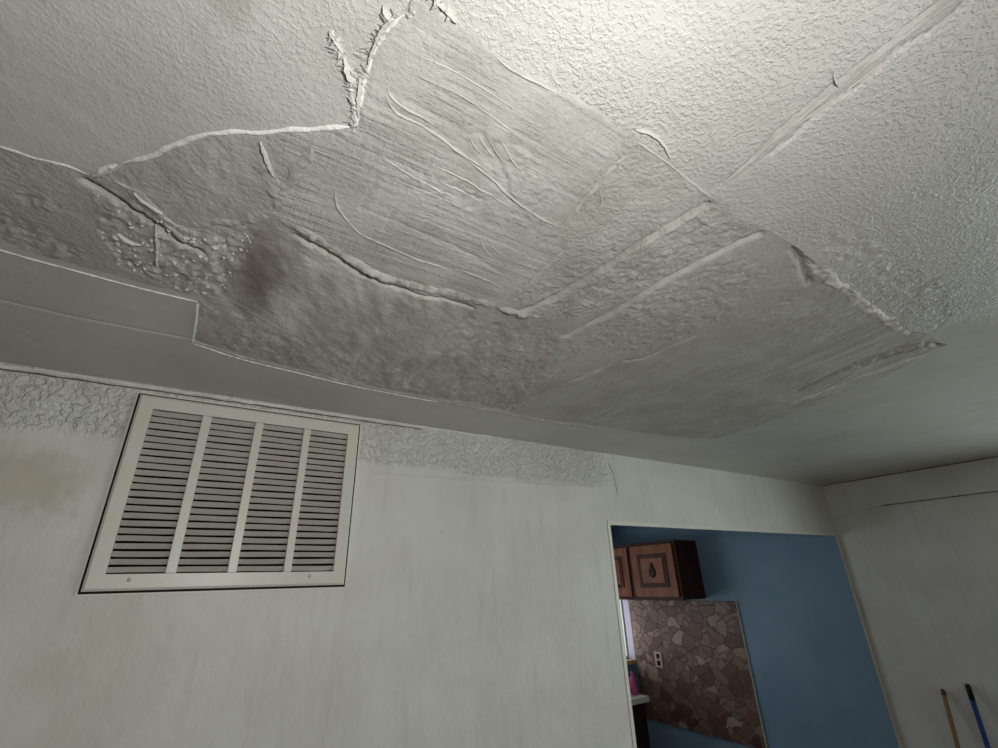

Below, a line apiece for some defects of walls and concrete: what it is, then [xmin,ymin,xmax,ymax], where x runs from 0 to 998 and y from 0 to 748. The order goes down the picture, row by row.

spalling [0,0,717,343]
flaking render [514,227,949,441]
crack [530,0,968,336]
crack [784,340,947,406]